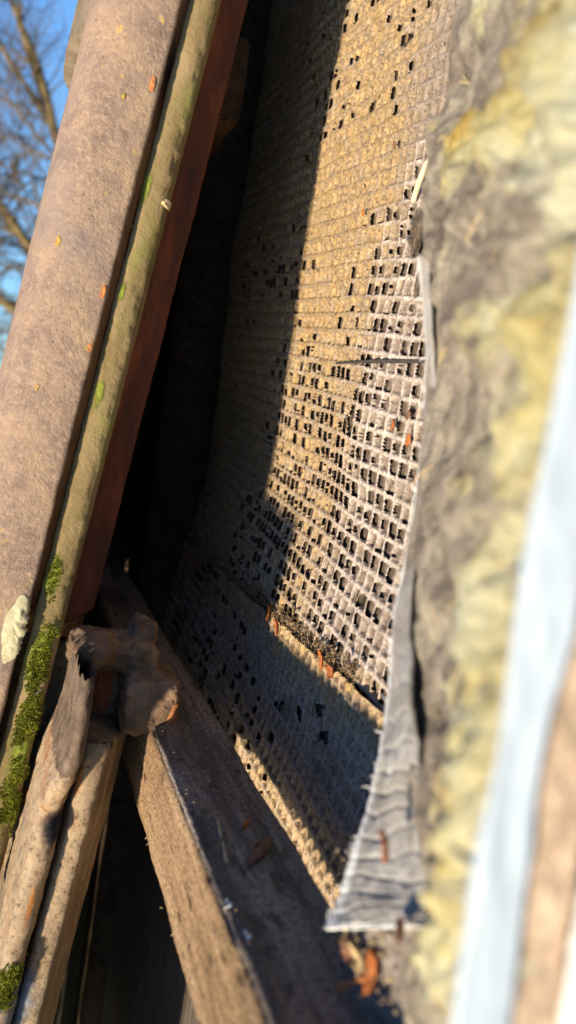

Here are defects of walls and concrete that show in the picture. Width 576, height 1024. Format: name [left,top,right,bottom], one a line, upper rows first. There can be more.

spalling [164,704,179,726]